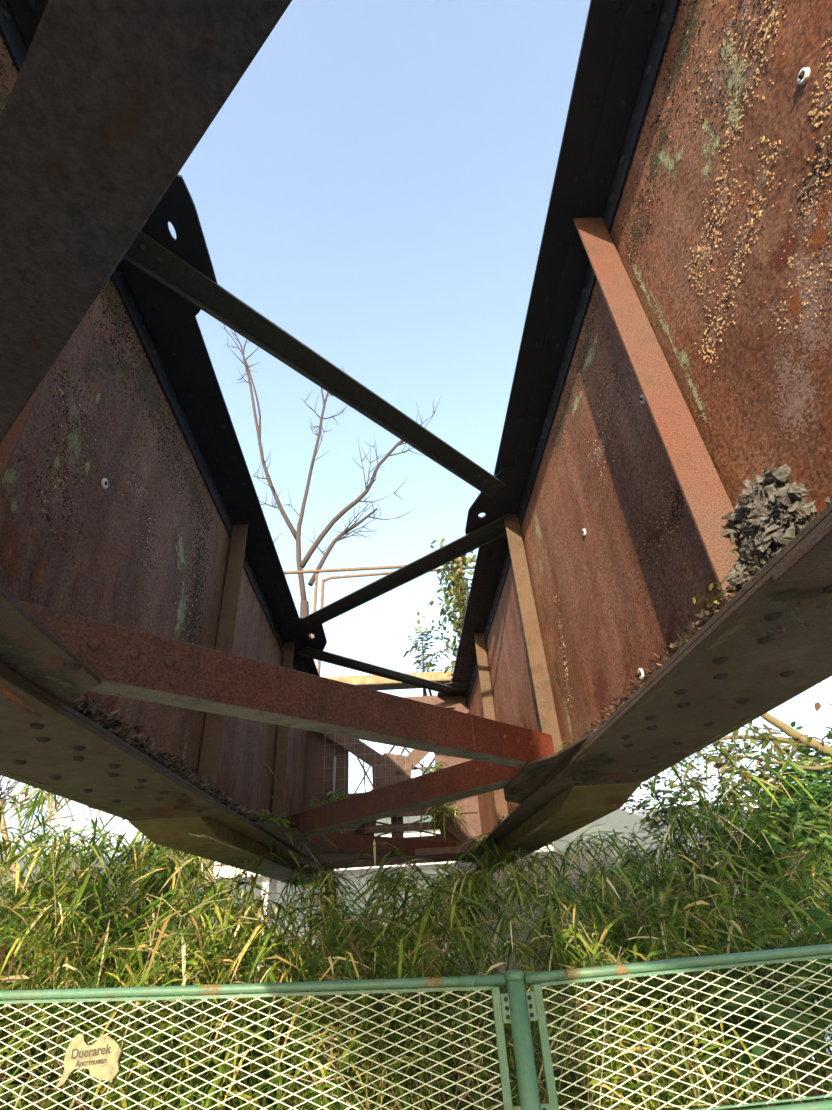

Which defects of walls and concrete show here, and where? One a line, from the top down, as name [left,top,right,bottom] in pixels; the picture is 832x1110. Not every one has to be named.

corrosion [769,196,832,448]